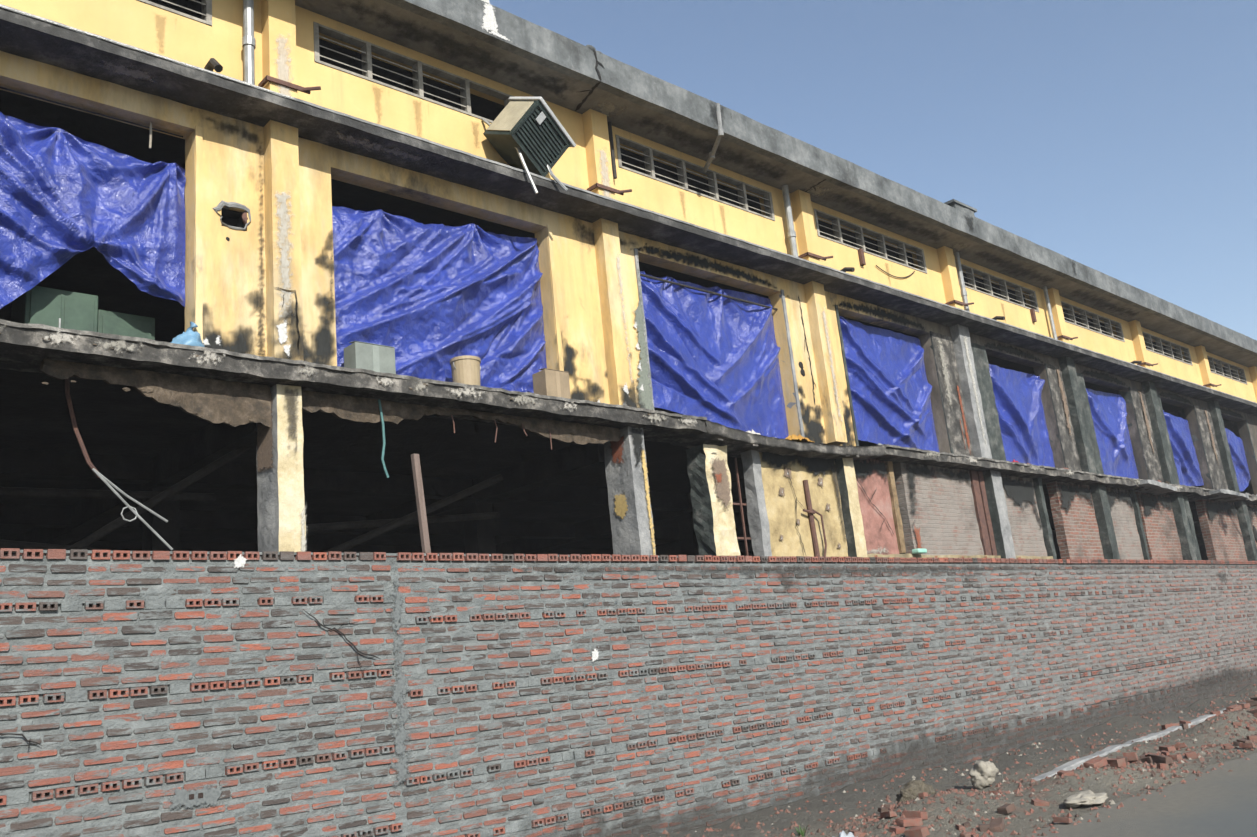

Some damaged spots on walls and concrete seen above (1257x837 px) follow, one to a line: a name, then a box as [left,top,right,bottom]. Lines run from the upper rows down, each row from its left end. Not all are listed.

spalling [42,331,79,344]
spalling [93,341,135,351]
spalling [40,350,271,427]
crack [303,609,380,667]